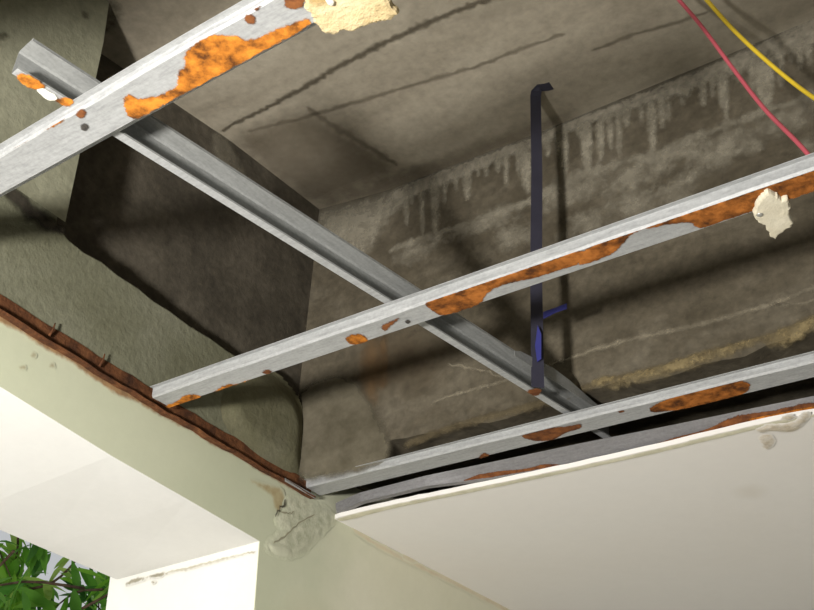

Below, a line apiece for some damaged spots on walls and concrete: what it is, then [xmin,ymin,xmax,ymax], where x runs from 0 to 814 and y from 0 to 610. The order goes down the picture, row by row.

corrosion [284,0,304,9]
corrosion [17,74,45,90]
corrosion [123,19,311,119]
crack [222,0,491,132]
leakage [542,19,814,213]
leakage [320,139,531,256]
corrosion [425,171,814,315]
corrosion [650,381,750,412]
corrosion [522,424,582,441]
corrosion [659,403,814,443]
corrosion [464,464,558,481]
crack [275,499,294,517]